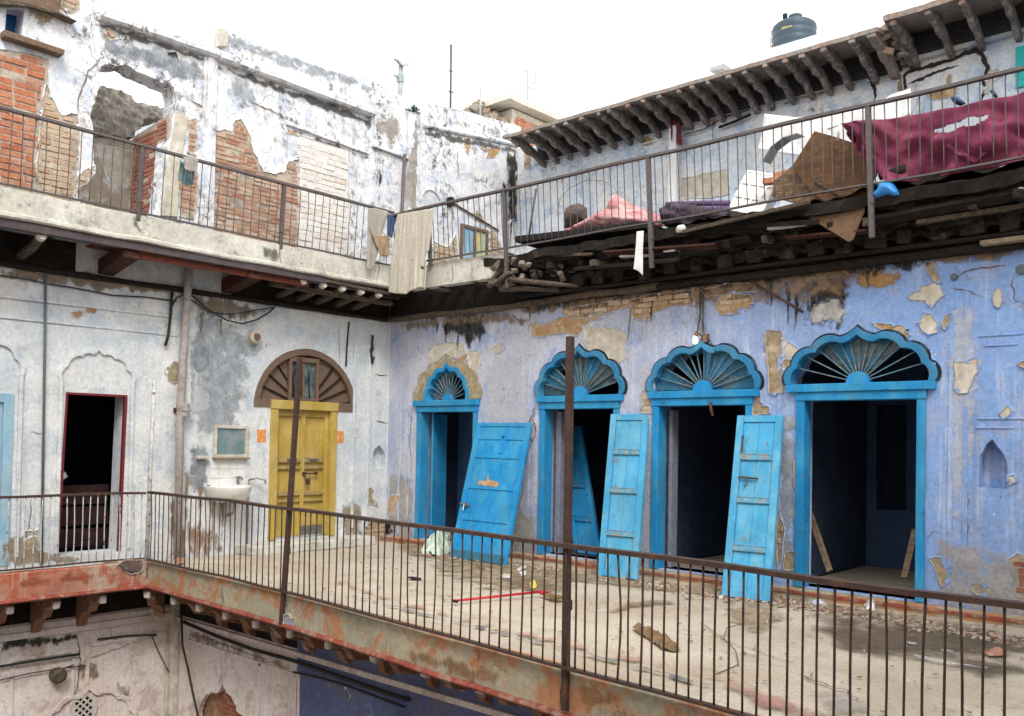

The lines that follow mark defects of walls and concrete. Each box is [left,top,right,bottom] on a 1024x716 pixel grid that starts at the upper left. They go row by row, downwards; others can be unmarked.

crack [903,47,990,100]
spalling [0,49,167,216]
spalling [214,118,348,258]
water stain [406,121,518,237]
spalling [428,340,505,376]
peeling [527,282,758,364]
water stain [406,251,1012,348]
spalling [752,329,801,415]
spalling [871,260,952,339]
spalling [953,357,981,394]
spalling [776,456,796,572]
spalling [928,555,953,588]